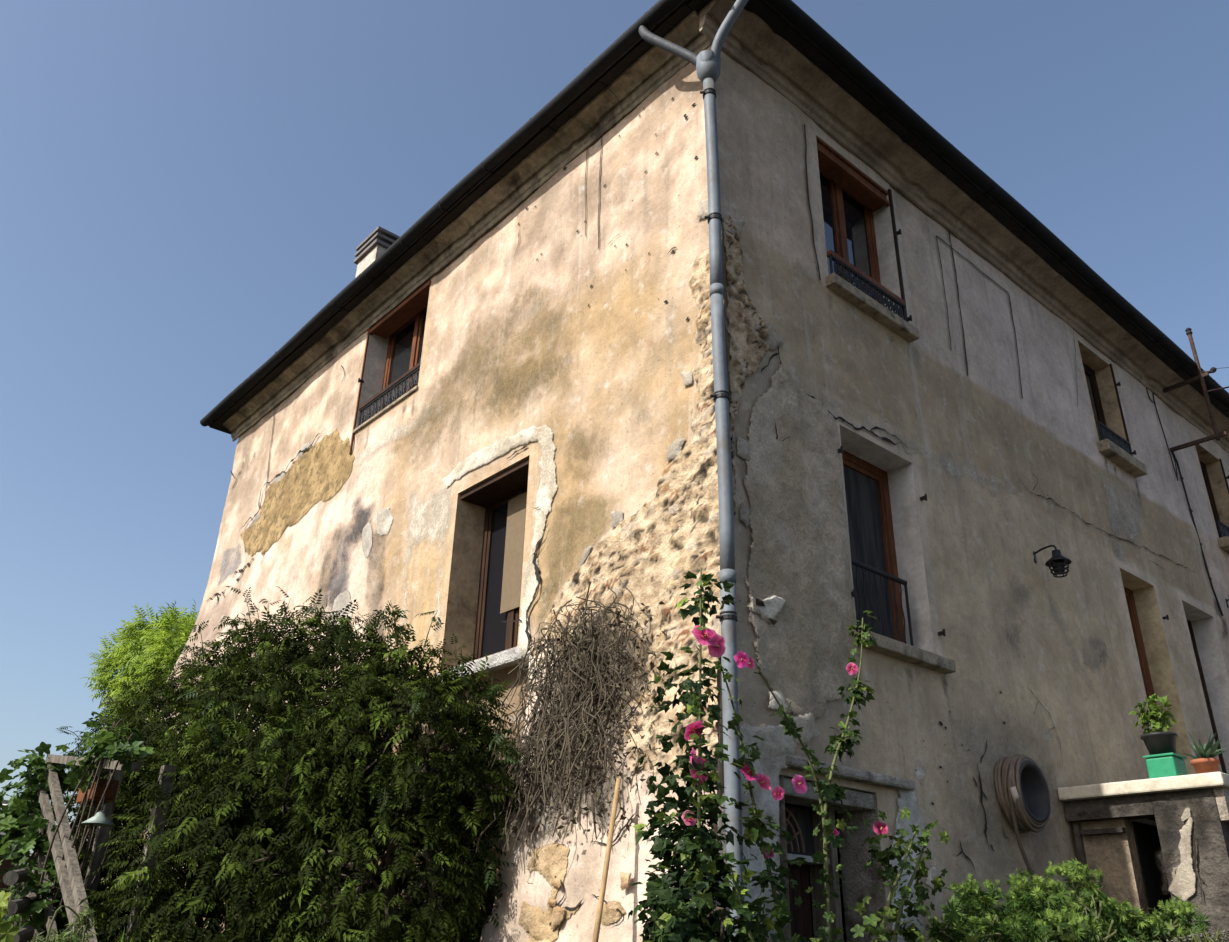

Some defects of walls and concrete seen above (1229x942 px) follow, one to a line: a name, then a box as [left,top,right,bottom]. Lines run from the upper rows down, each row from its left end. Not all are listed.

crack [761,346,909,454]
peeling [238,429,354,556]
damp [316,500,384,638]
peeling [443,424,558,689]
flaking render [544,214,860,940]
flaking render [518,842,579,942]